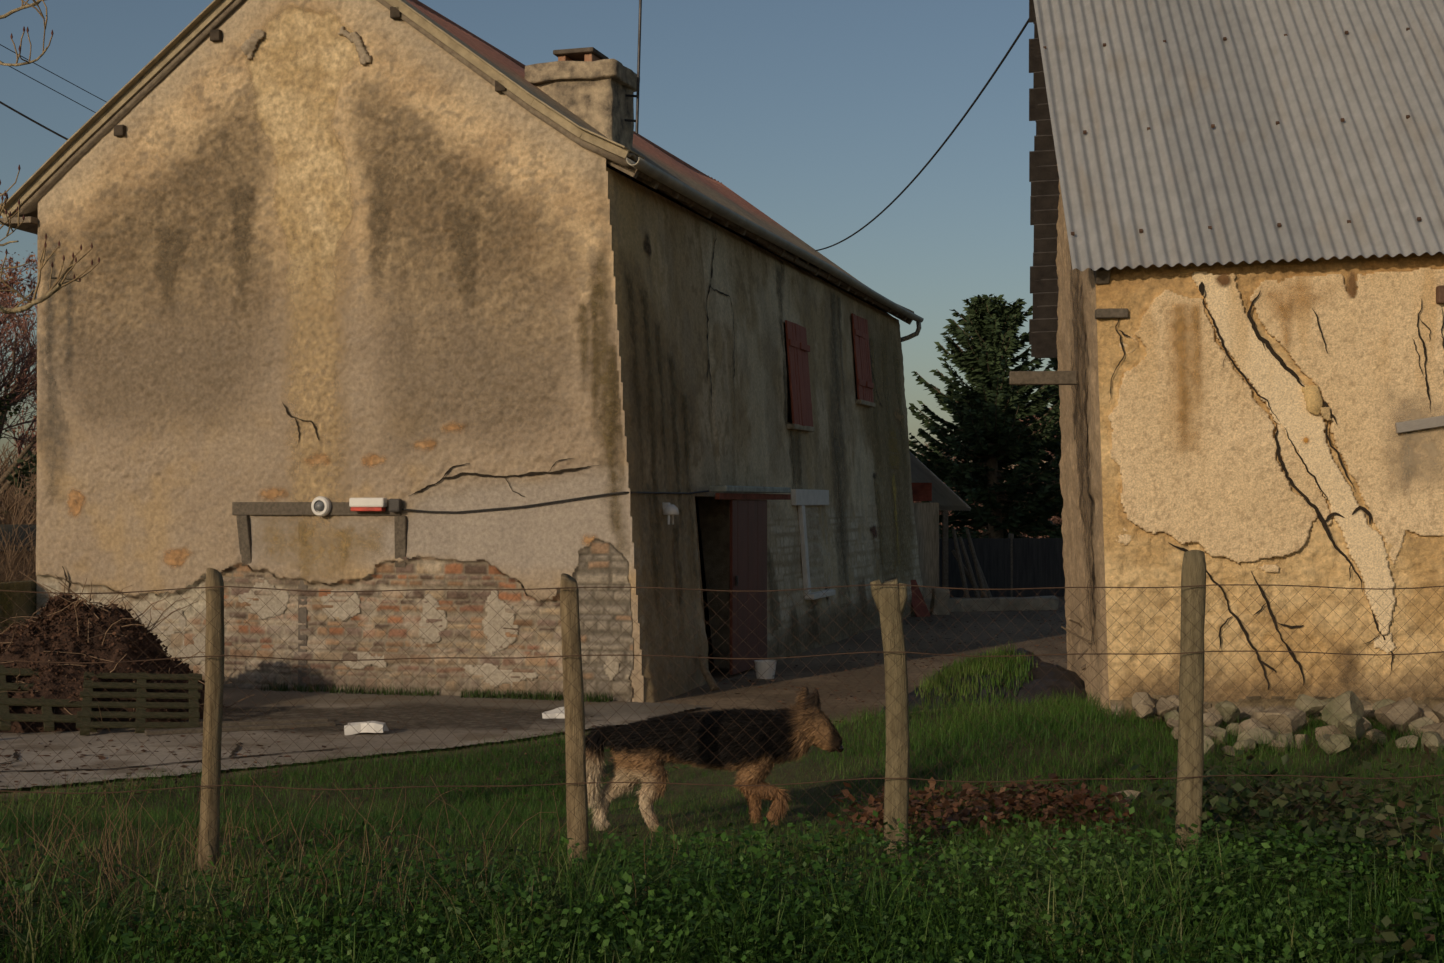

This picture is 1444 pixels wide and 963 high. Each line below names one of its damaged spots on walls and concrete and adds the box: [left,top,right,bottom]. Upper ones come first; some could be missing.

crack [282,402,320,446]
crack [410,458,599,497]
crack [706,226,735,406]
peeling [1108,268,1444,654]
crack [1199,282,1394,675]
crack [1413,300,1444,411]
spalling [36,555,564,698]
spalling [572,537,633,702]